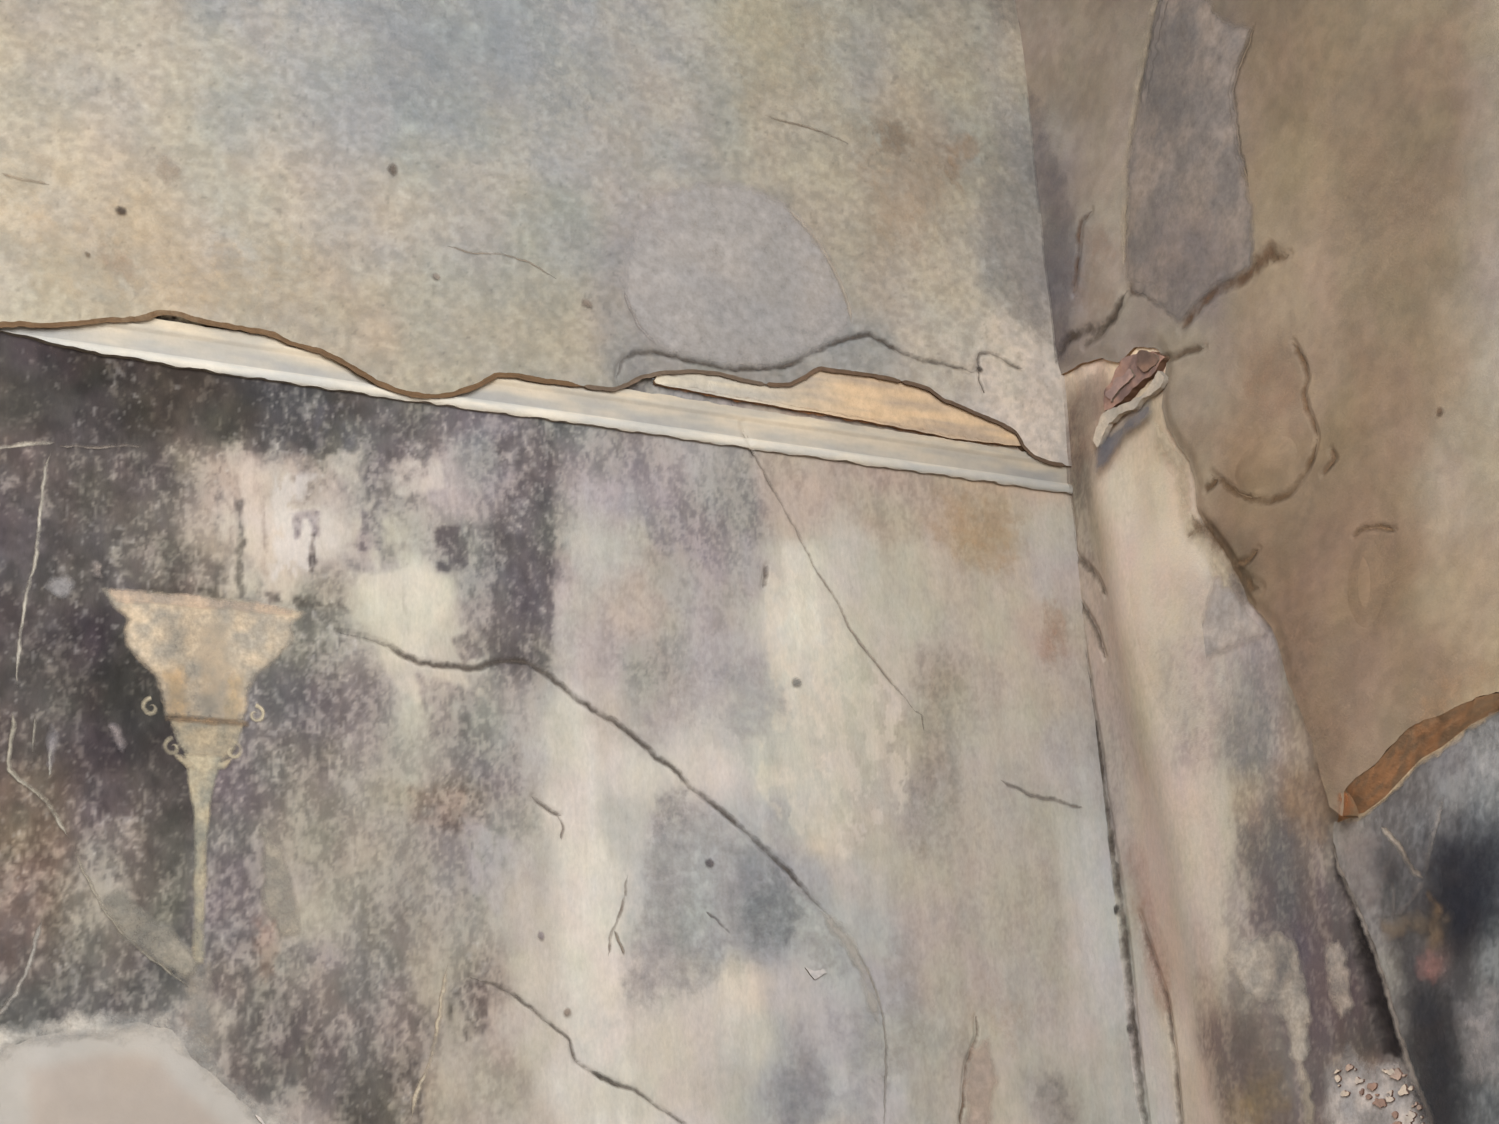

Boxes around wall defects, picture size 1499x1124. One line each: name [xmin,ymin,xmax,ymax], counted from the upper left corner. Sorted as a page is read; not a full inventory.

spalling [1122,0,1253,320]
crack [0,310,1066,466]
spalling [653,371,1021,447]
spalling [1093,350,1170,448]
crack [795,529,891,683]
flaking render [1202,576,1263,655]
crack [393,649,800,886]
spalling [1337,693,1499,823]
crack [609,904,624,954]
spalling [0,1014,280,1124]
crack [484,982,682,1123]
water stain [1410,994,1455,1124]